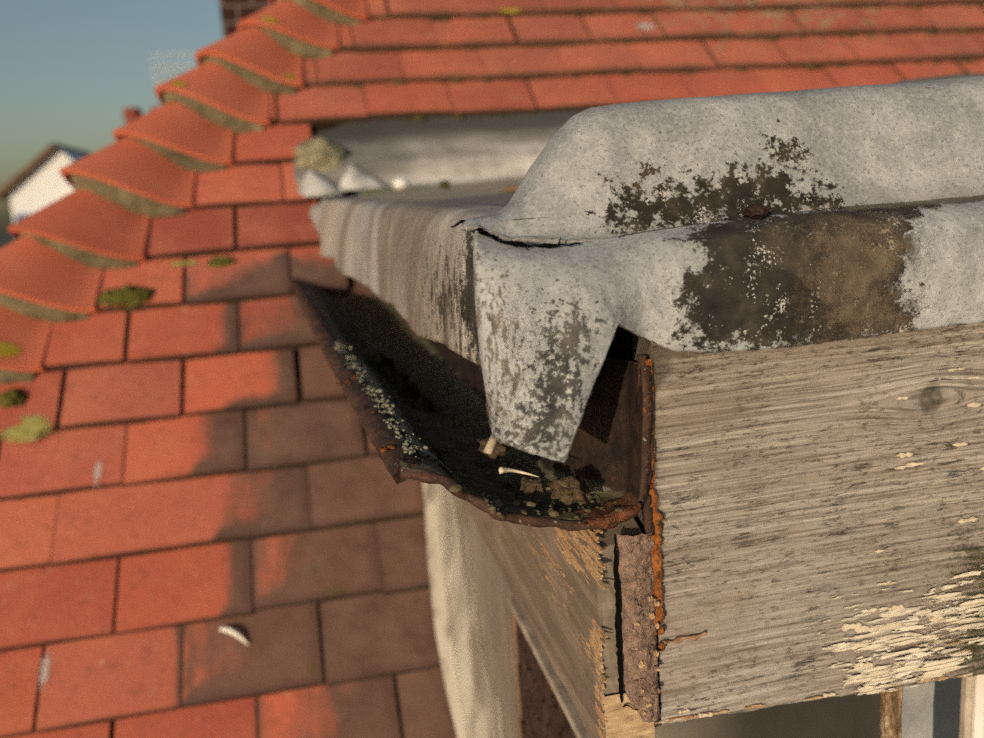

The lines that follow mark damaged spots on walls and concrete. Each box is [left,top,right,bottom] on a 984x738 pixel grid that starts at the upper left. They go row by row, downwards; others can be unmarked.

crack [450,216,581,251]
leakage [585,131,984,353]
leakage [421,227,616,461]
spalling [419,471,609,738]
rust [578,451,707,652]
peeling [617,532,730,724]
peeling [804,565,984,700]
peeling [894,452,925,470]